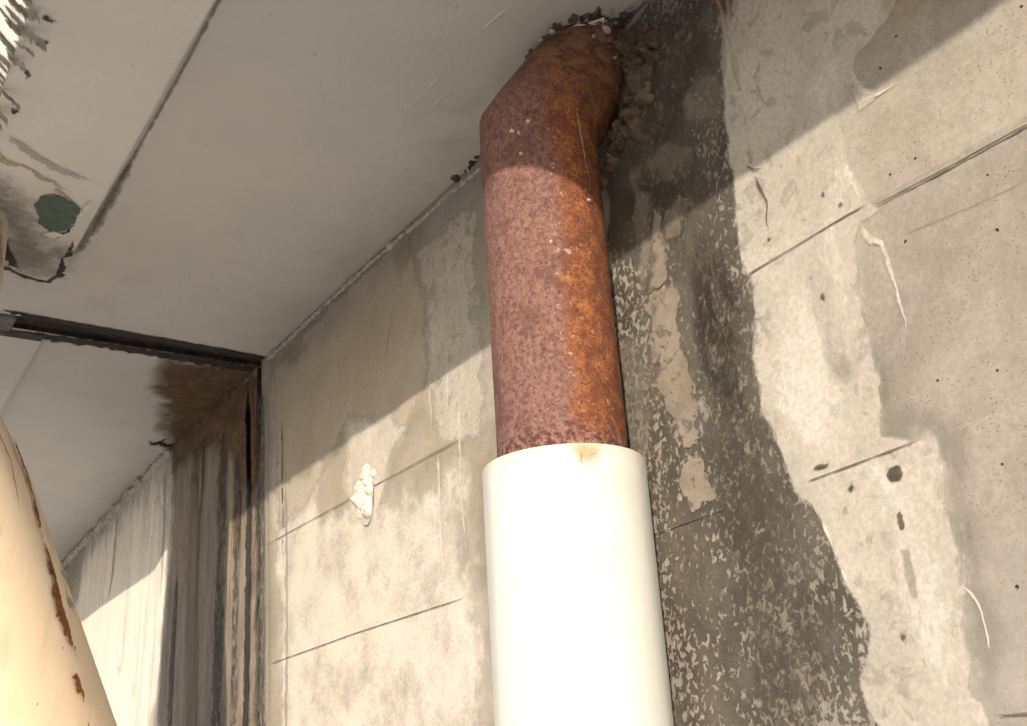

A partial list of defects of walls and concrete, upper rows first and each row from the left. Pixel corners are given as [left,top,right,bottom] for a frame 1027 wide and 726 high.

peeling [0,139,92,239]
crack [0,435,20,509]
water stain [75,201,487,726]
corrosion [15,441,77,654]
corrosion [72,673,85,703]